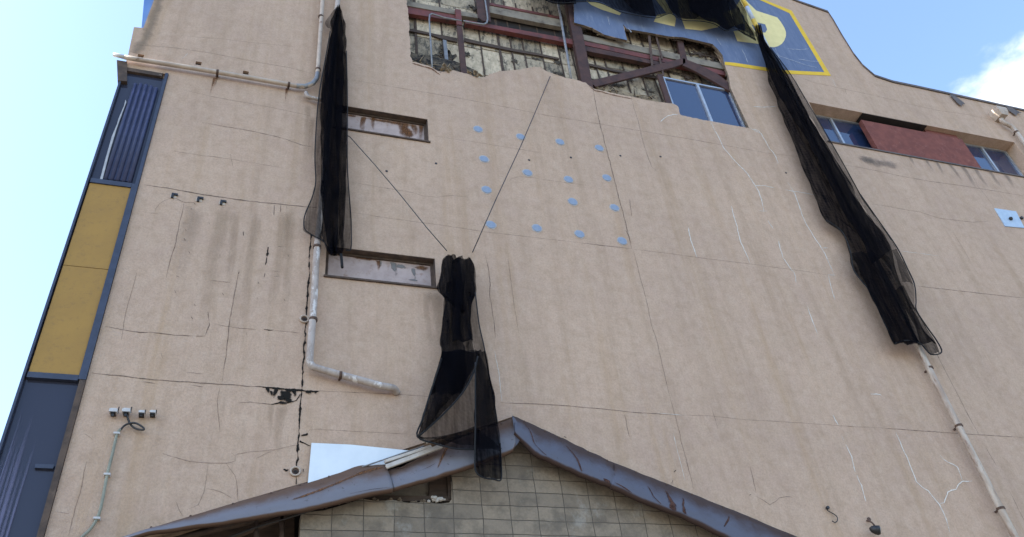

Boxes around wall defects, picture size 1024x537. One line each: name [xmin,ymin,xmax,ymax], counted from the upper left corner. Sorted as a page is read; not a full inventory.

spalling [413,44,470,75]
corrosion [348,115,423,136]
crack [149,185,305,277]
crack [711,106,835,299]
crack [96,235,312,484]
crack [888,428,969,532]